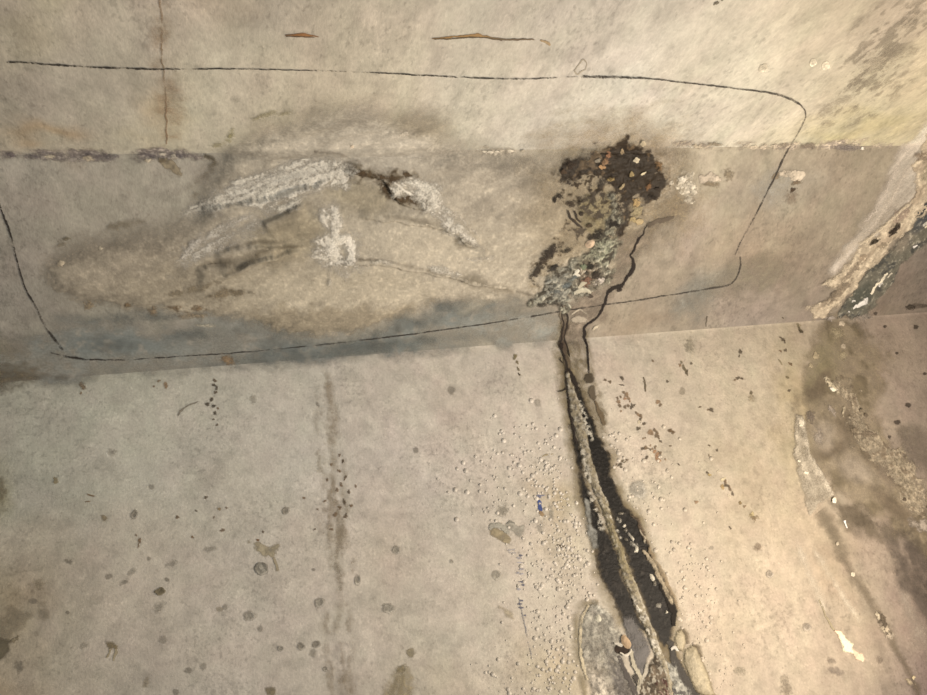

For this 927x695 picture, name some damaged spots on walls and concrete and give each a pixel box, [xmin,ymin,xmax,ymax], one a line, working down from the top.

crack [159,0,168,144]
corrosion [432,33,551,46]
leakage [0,157,698,387]
spalling [527,192,623,315]
peeling [848,273,892,312]
crack [542,216,702,695]
leakage [802,313,927,637]
leakage [819,600,864,662]